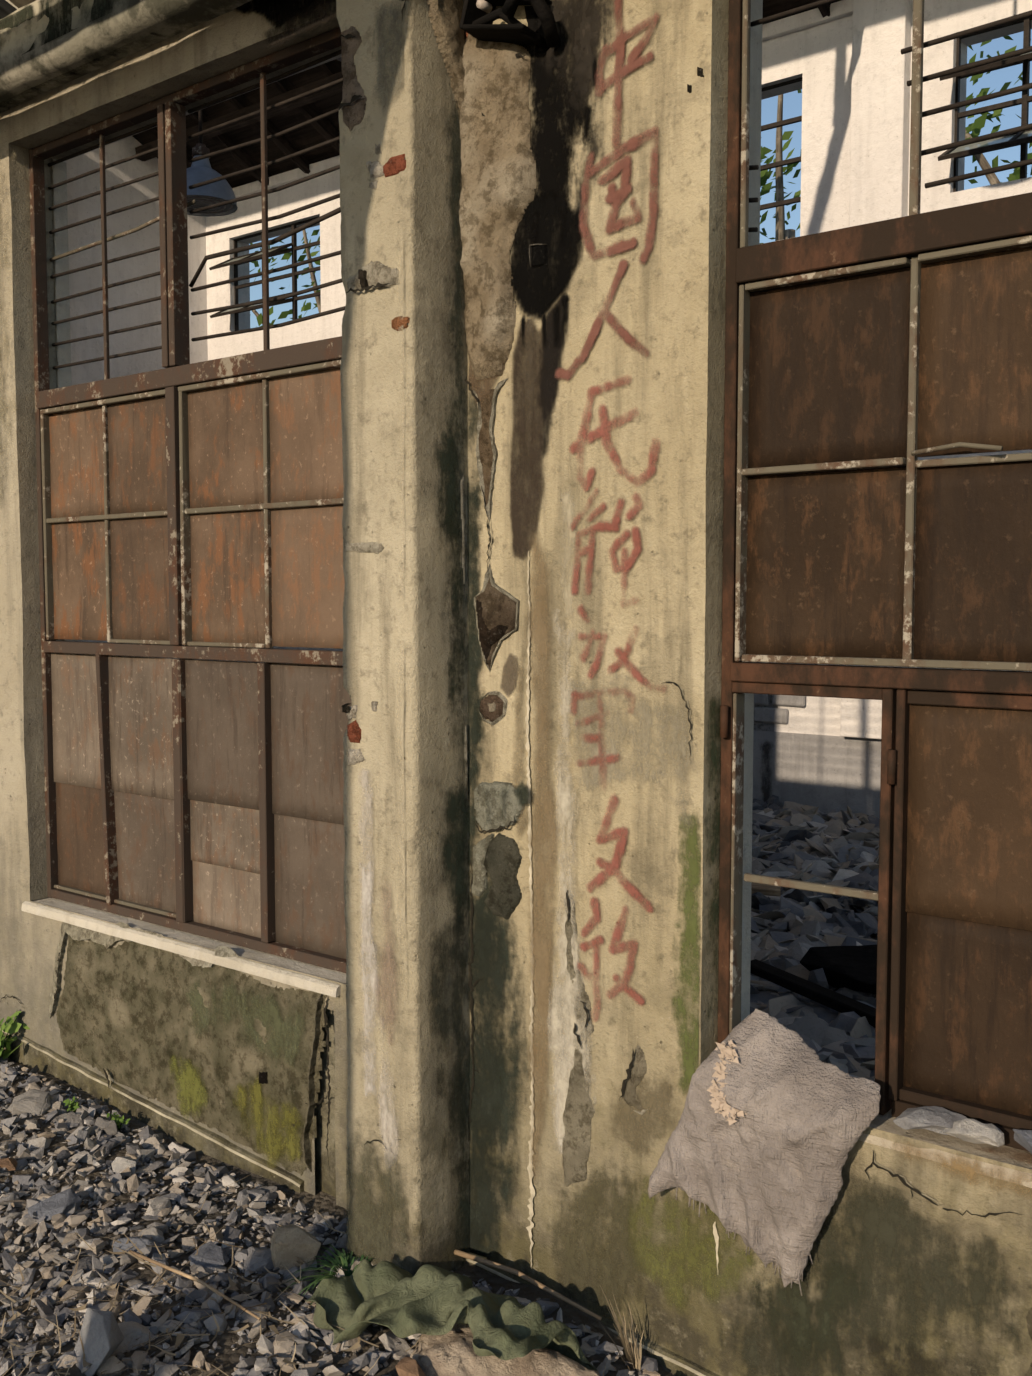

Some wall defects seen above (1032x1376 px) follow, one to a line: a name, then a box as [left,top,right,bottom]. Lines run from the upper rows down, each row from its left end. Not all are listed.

leakage [0,0,112,55]
leakage [235,0,323,28]
flaking render [474,564,520,671]
flaking render [478,691,508,726]
leakage [429,107,589,1266]
flaking render [472,833,522,931]
flaking render [562,888,595,1187]
flaking render [614,1044,671,1151]
crack [864,1151,1022,1218]
leakage [552,1172,640,1317]
leakage [733,1186,1019,1376]